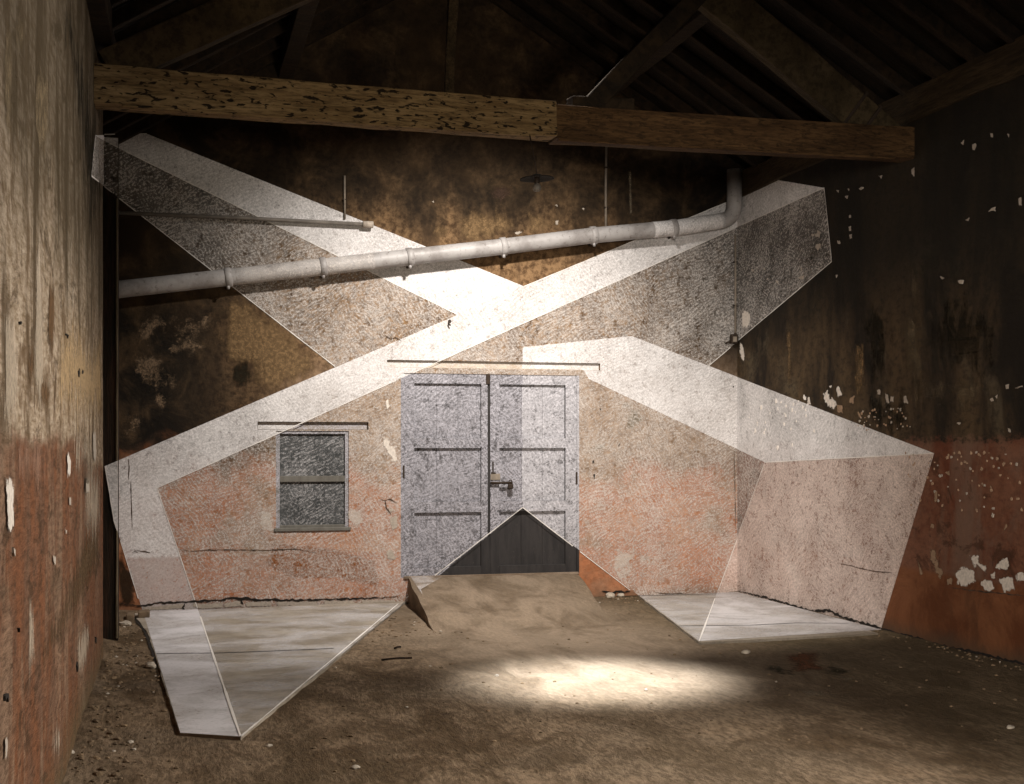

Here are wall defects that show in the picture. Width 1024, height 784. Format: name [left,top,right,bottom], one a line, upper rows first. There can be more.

peeling [824,385,911,433]
peeling [6,478,14,533]
peeling [918,548,1024,593]
crack [122,596,398,669]